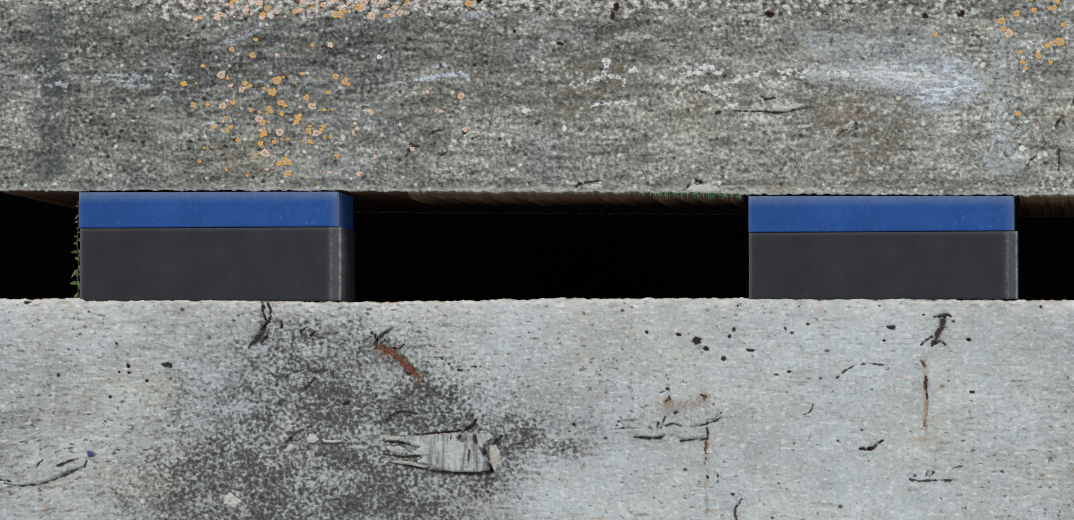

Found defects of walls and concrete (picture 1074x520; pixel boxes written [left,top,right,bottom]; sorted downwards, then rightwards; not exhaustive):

crack [699,90,814,115]
crack [248,301,316,348]
crack [920,313,952,347]
rust [370,329,448,400]
leakage [112,318,580,520]
spalling [383,419,503,476]
spalling [617,394,722,460]